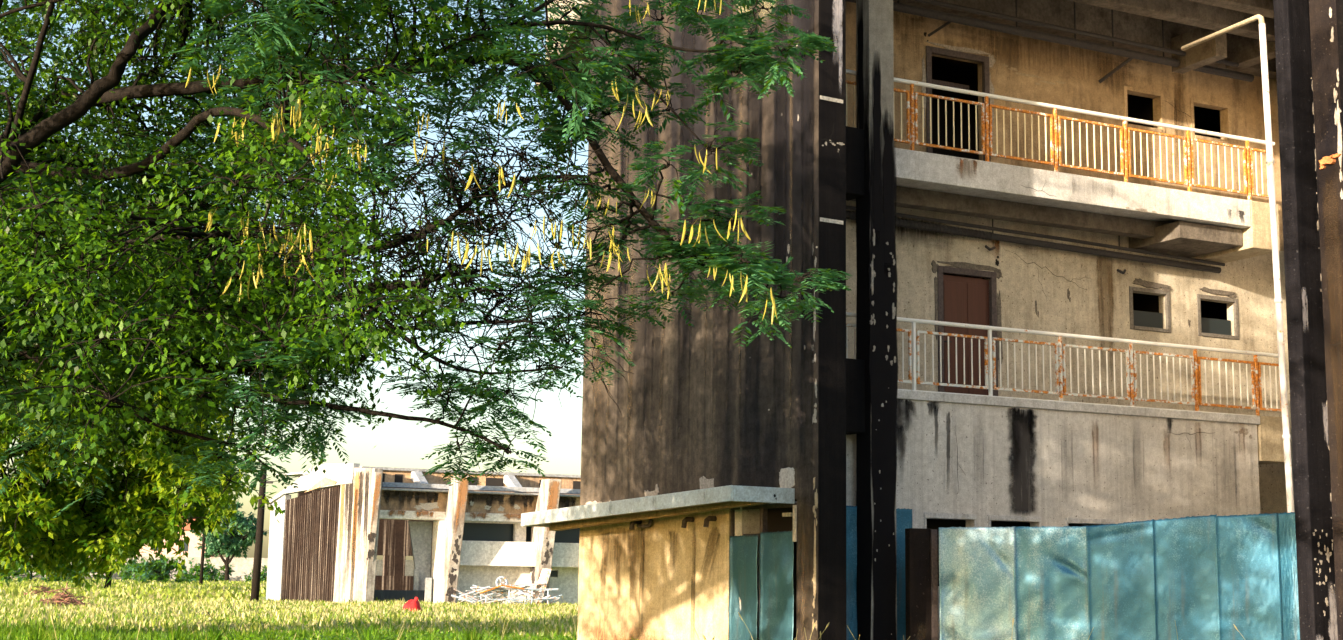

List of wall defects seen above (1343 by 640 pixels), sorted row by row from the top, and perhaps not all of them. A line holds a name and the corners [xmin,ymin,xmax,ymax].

spalling [1315,69,1343,230]
peeling [870,229,896,328]
leakage [896,399,950,472]
leakage [1008,408,1036,514]
leakage [602,528,644,581]
peeling [1313,517,1335,616]